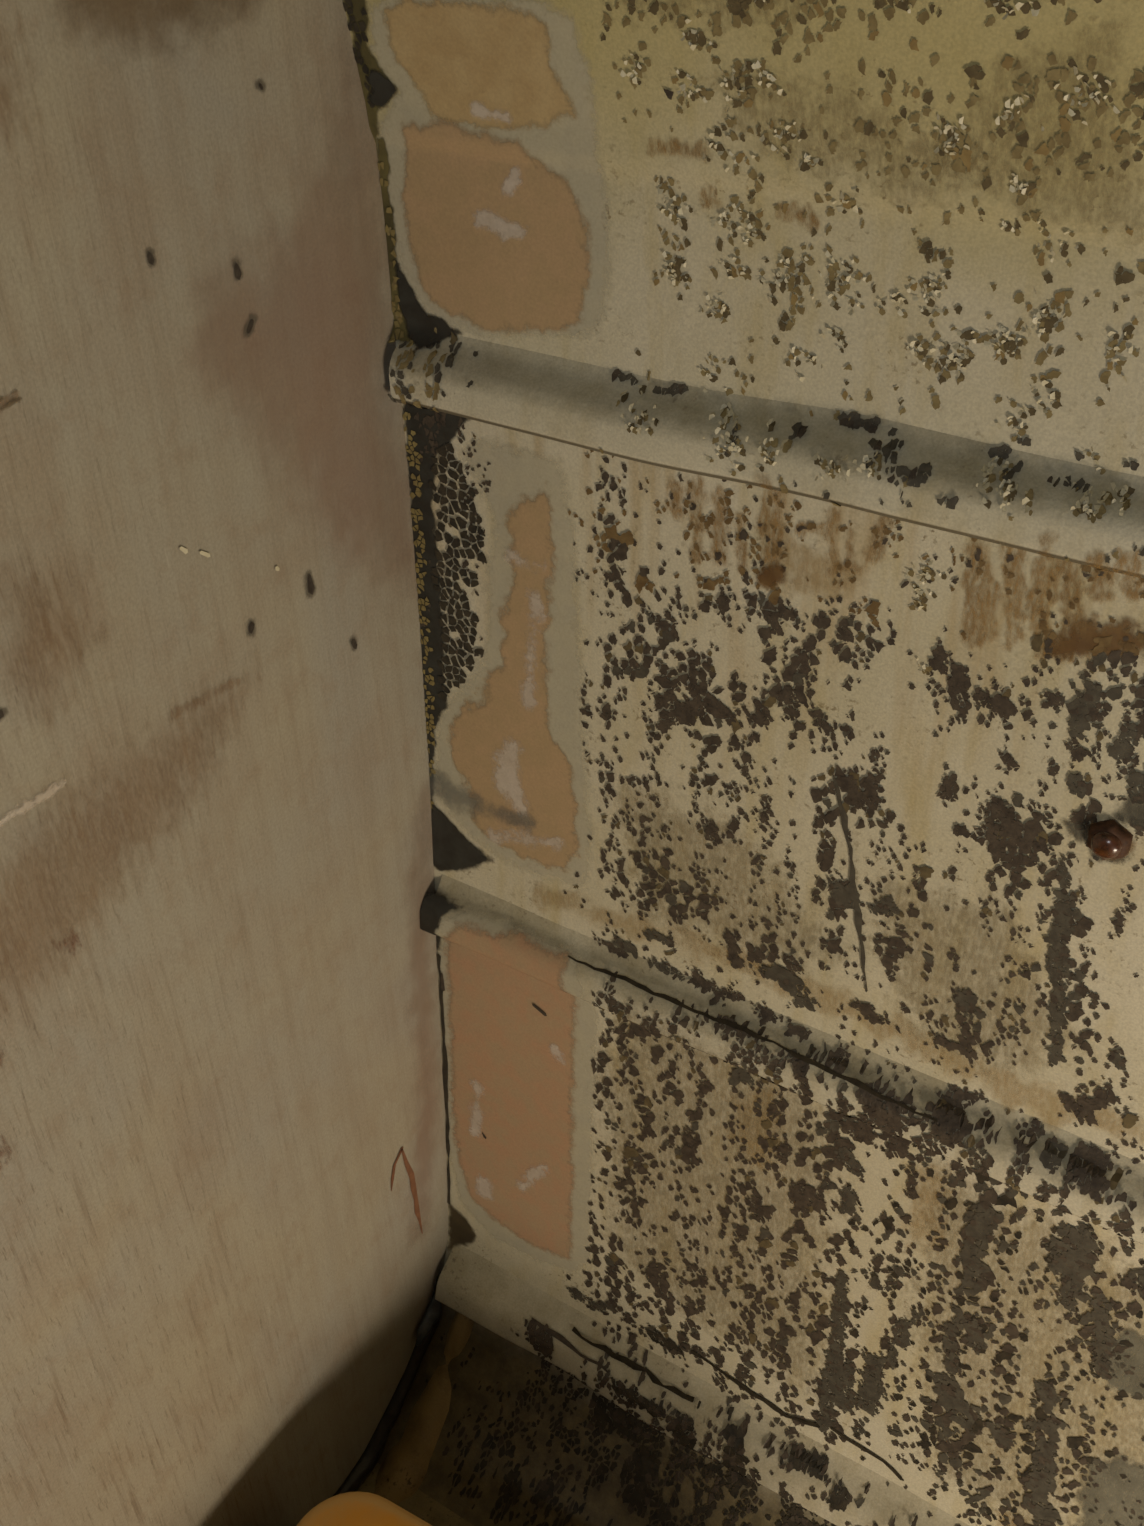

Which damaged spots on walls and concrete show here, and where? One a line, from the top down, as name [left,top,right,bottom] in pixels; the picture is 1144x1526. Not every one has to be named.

peeling [385,207,491,572]
peeling [442,0,1144,1526]
rust [1064,821,1134,863]
rust [1113,793,1144,827]
crack [568,955,938,1122]
crack [531,1318,904,1481]